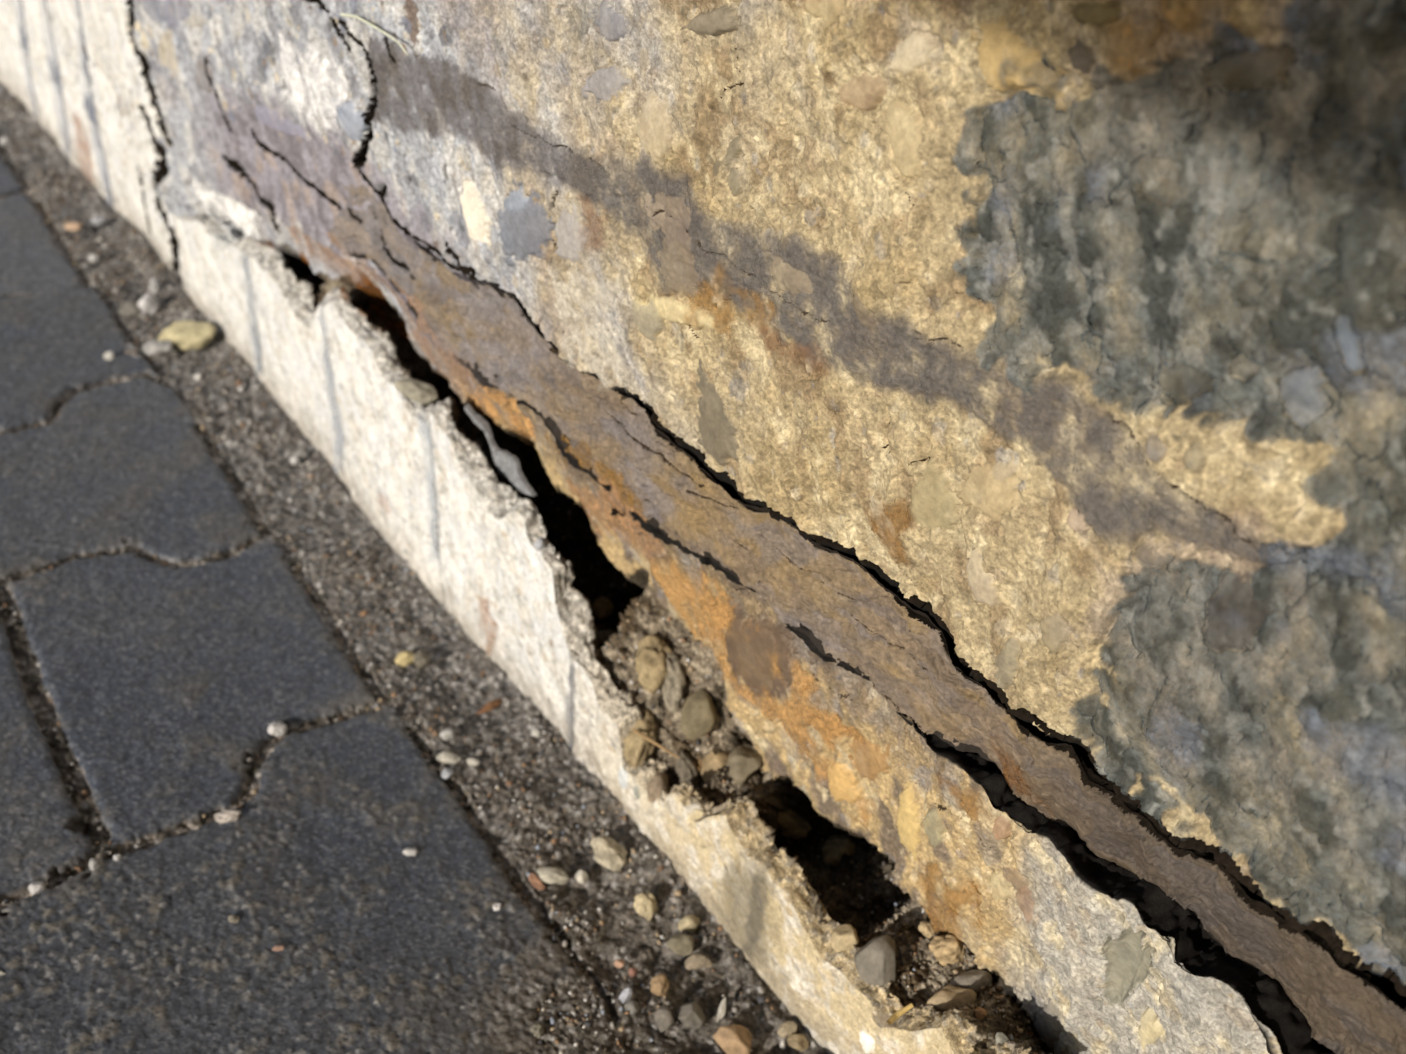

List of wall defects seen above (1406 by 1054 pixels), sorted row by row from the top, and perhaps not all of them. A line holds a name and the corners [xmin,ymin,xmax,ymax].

crack [125,0,183,286]
crack [204,0,478,280]
corrosion [340,277,412,343]
corrosion [467,387,535,437]
crack [515,240,584,367]
crack [480,83,830,323]
corrosion [649,564,859,777]
spalling [133,0,1406,769]
spalling [230,183,1406,1054]
corrosion [871,504,910,559]
crack [587,381,1406,1011]
damp [952,0,1406,986]